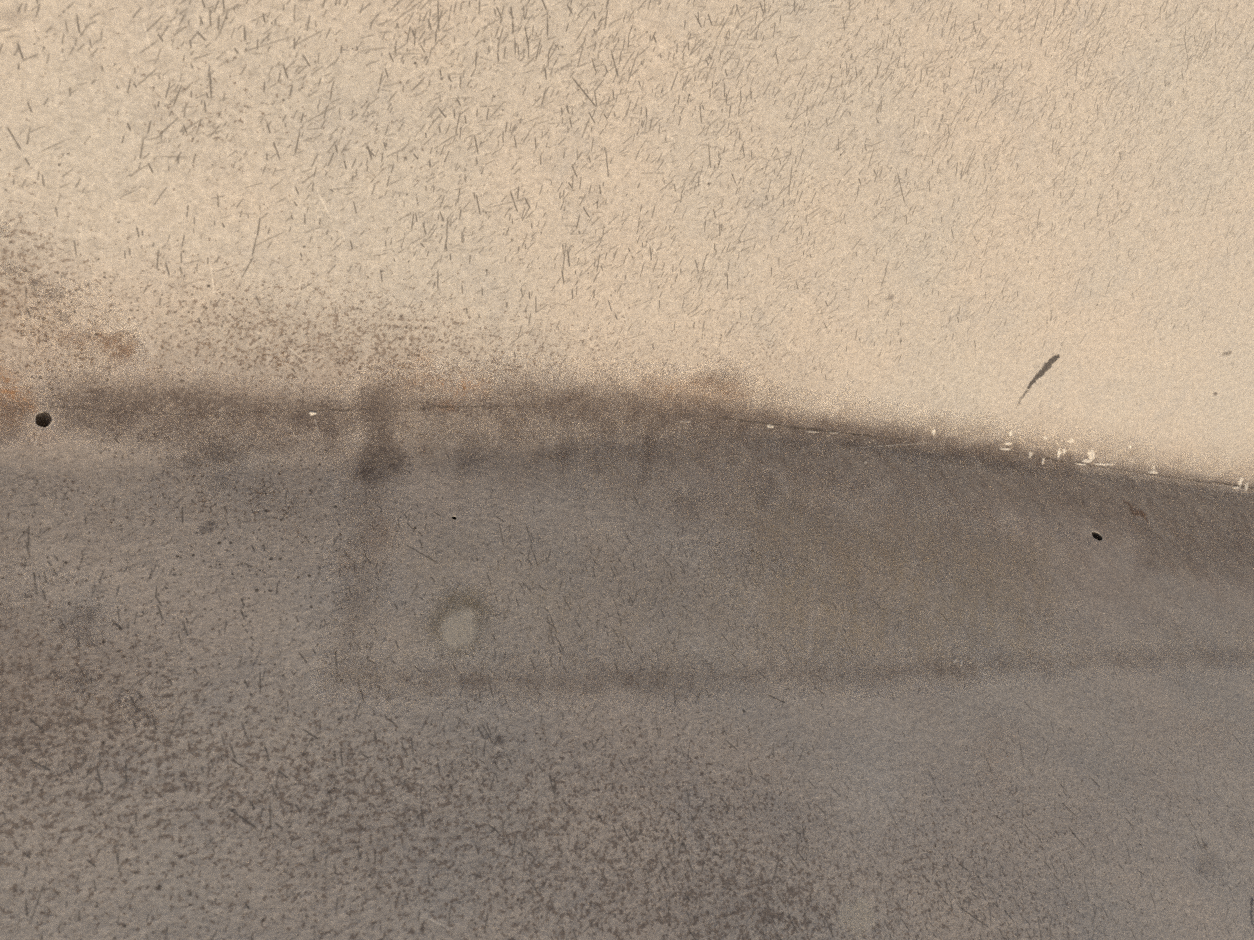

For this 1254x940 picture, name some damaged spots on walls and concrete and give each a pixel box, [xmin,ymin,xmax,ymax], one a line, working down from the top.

water stain [1024,355,1060,395]
water stain [50,380,1254,578]
water stain [437,604,475,647]